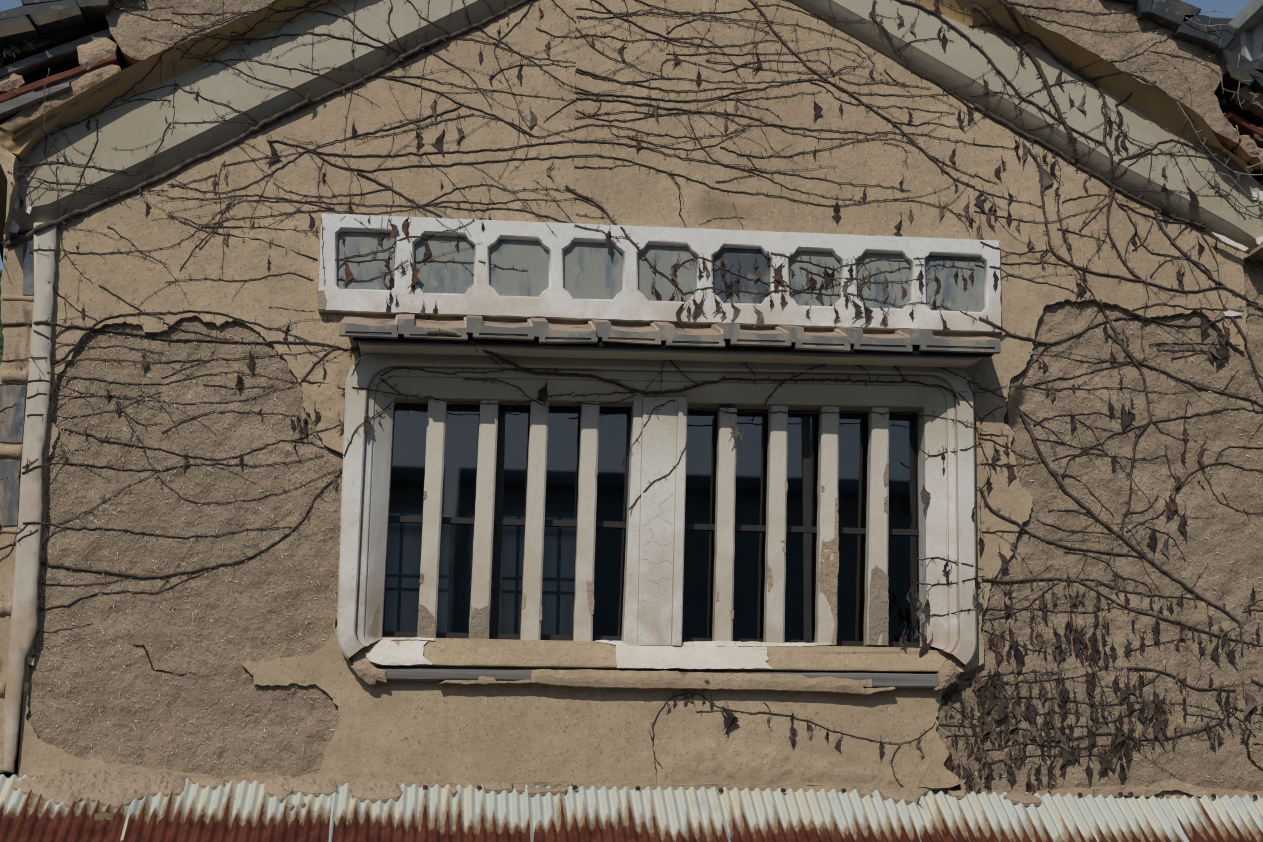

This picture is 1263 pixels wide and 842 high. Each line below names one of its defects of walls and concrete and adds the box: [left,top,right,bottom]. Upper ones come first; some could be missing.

flaking render [1210,232,1263,252]
flaking render [142,323,169,334]
flaking render [366,603,436,666]
flaking render [469,605,489,639]
flaking render [595,485,839,669]
flaking render [868,566,889,646]
corrosion [0,775,1263,842]